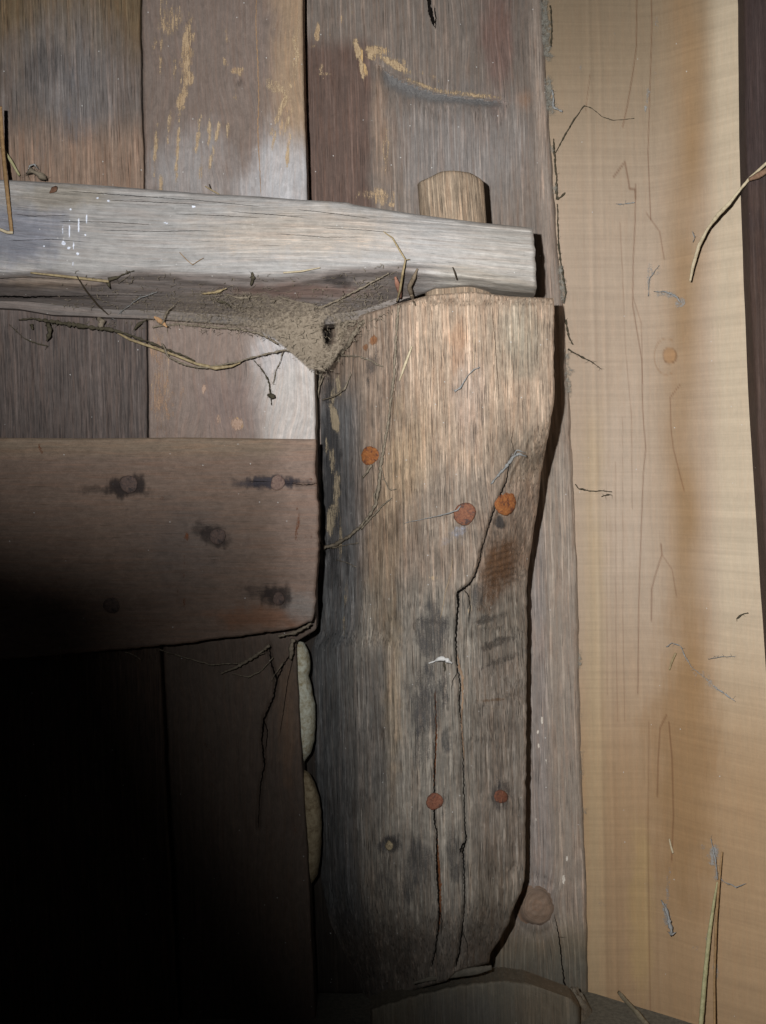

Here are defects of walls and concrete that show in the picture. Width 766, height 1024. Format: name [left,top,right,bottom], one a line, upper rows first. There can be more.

crack [431,433,514,967]